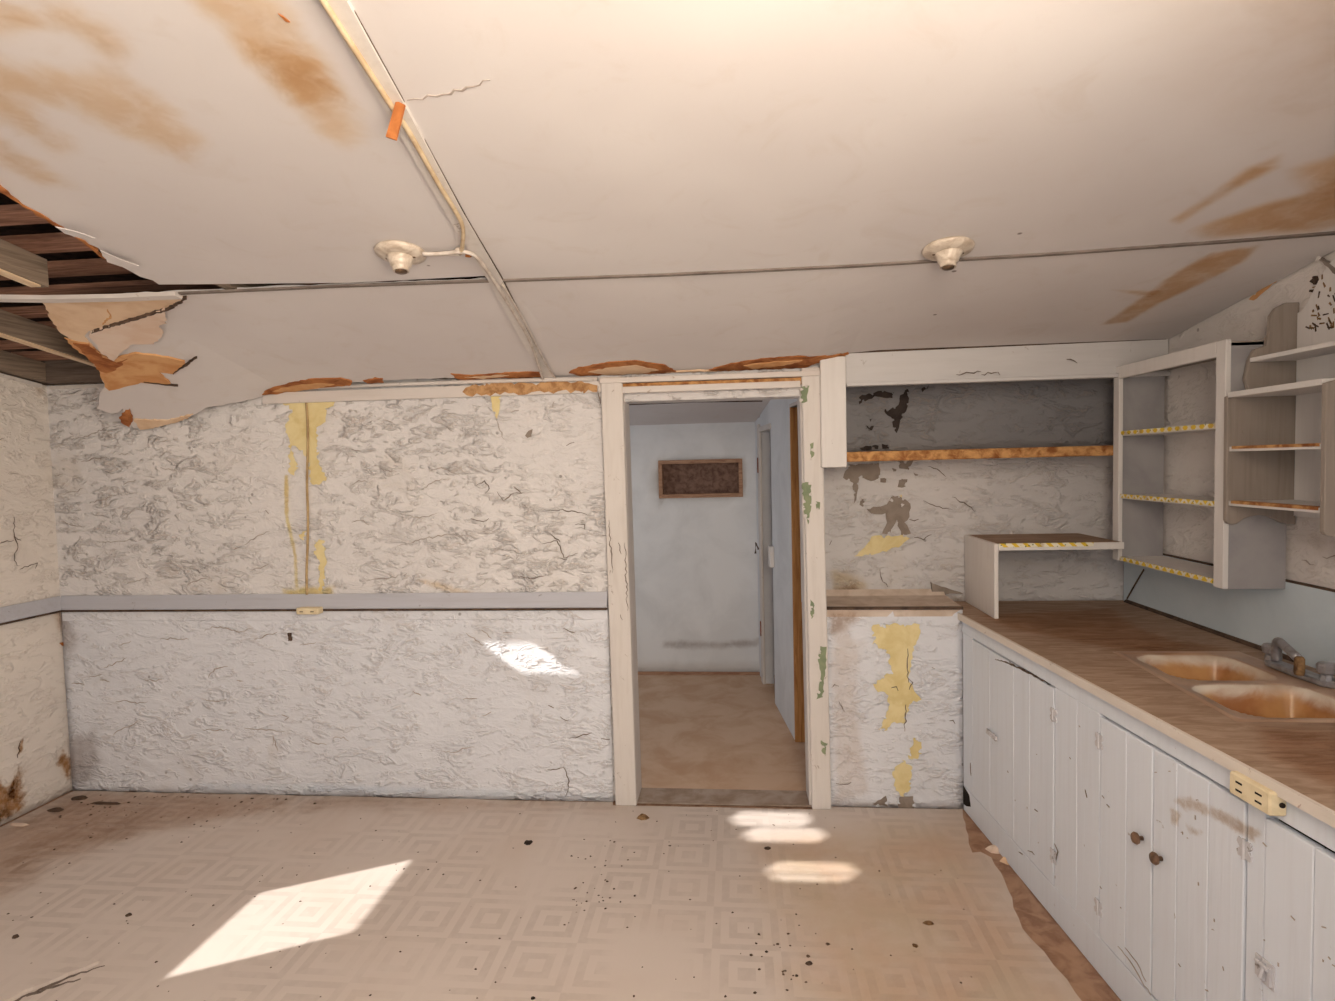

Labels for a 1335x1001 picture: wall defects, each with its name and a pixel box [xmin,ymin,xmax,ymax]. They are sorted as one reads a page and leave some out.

crack [407,79,490,101]
peeling [1315,256,1335,274]
peeling [283,402,335,485]
peeling [843,384,929,556]
peeling [298,530,327,591]
peeling [871,623,922,732]
peeling [873,736,922,808]